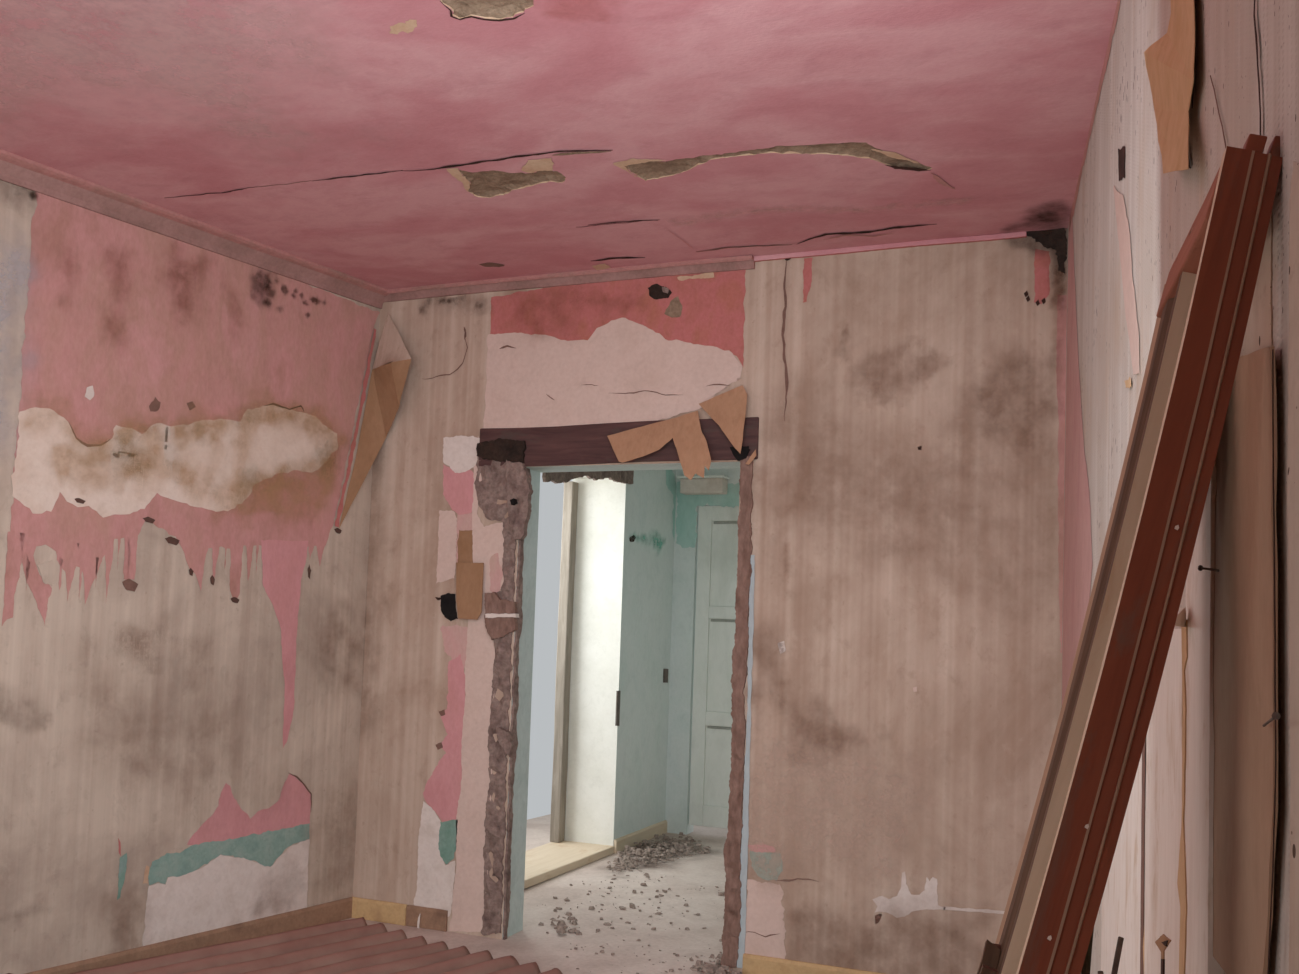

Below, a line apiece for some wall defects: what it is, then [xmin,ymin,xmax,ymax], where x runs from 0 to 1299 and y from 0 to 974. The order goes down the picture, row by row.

crack [167,150,611,198]
spalling [613,142,955,189]
damp [256,275,318,316]
crack [593,257,645,270]
crack [586,219,653,227]
crack [698,224,935,421]
damp [1026,211,1067,283]
crack [585,384,675,396]
peeling [2,192,380,747]
flaking render [414,270,746,940]
flaking render [720,456,786,968]
flaking render [142,773,312,946]